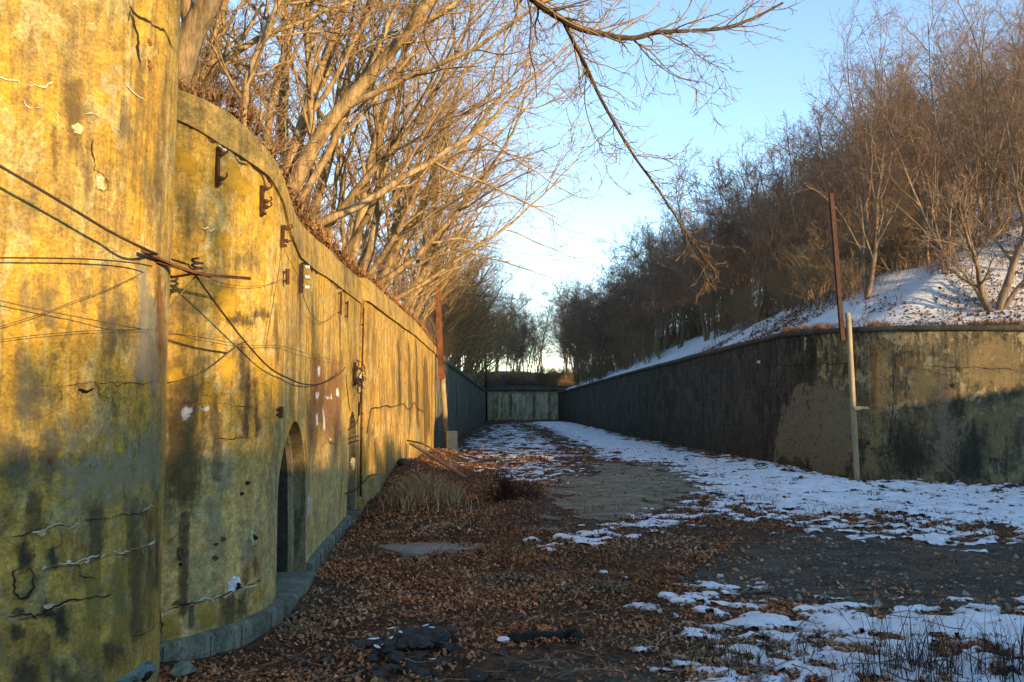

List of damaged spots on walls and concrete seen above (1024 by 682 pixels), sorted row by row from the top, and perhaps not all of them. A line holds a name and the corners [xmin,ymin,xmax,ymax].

crack [125,3,175,100]
peeling [212,273,245,319]
damp [15,349,43,425]
peeling [168,367,185,385]
peeling [181,356,237,420]
damp [885,371,991,478]
damp [0,435,42,573]
damp [47,548,58,568]
damp [89,504,105,558]
crack [4,493,198,631]
damp [127,500,159,635]
spalling [227,575,241,592]